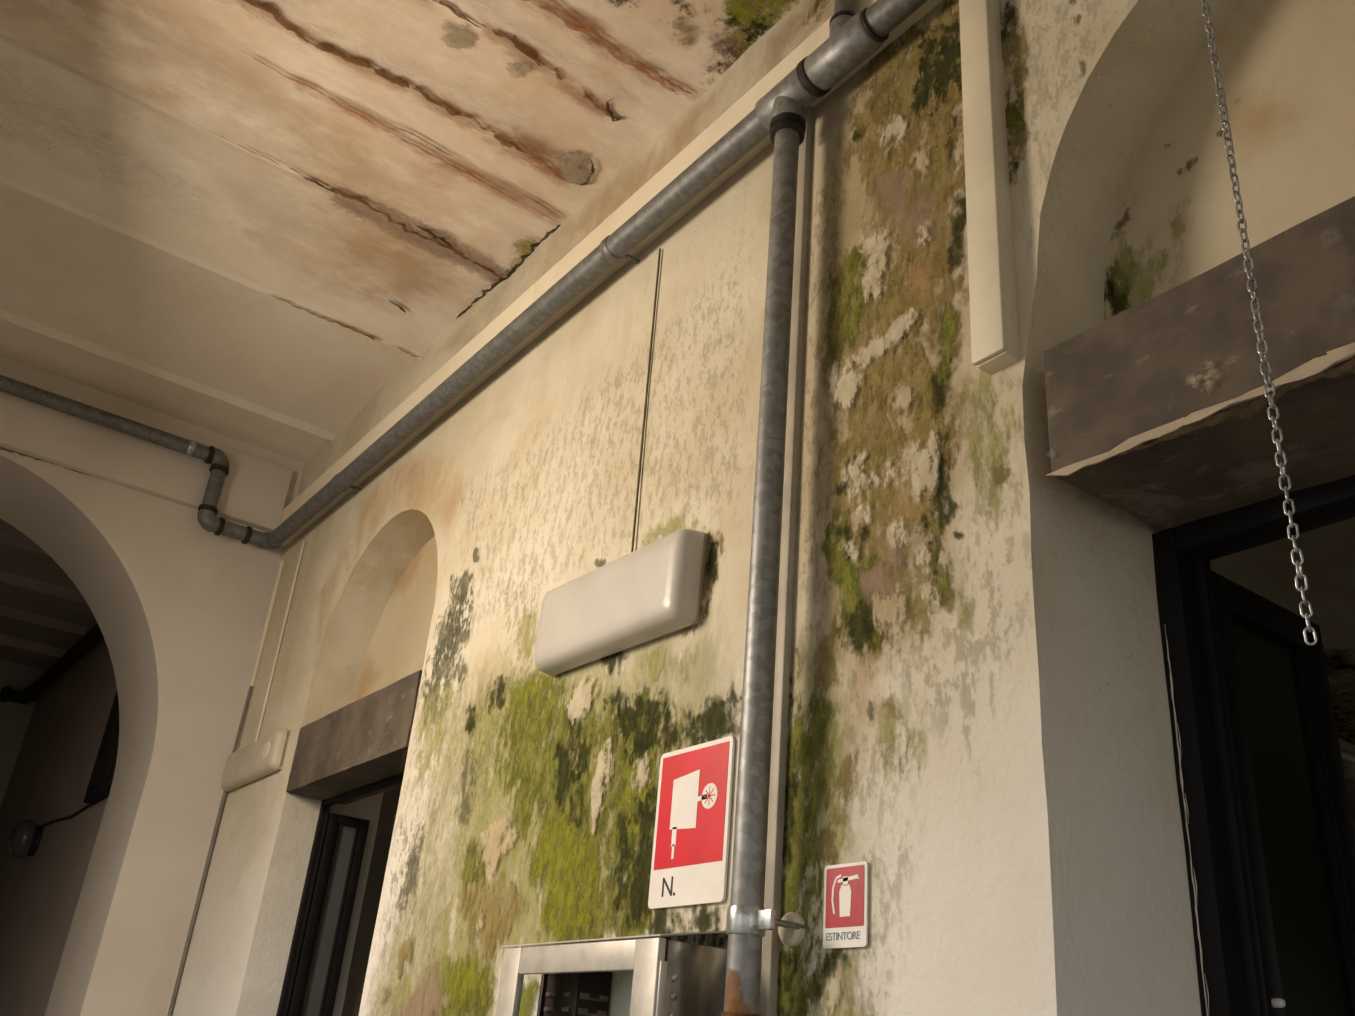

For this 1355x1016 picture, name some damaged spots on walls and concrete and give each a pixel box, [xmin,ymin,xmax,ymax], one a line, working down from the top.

crack [523,0,693,95]
water stain [672,0,828,84]
crack [202,0,623,319]
water stain [964,372,1019,512]
water stain [643,516,723,636]
water stain [417,548,479,780]
water stain [517,612,535,659]
water stain [455,750,477,822]
water stain [397,836,422,910]
corrosion [725,970,750,1013]